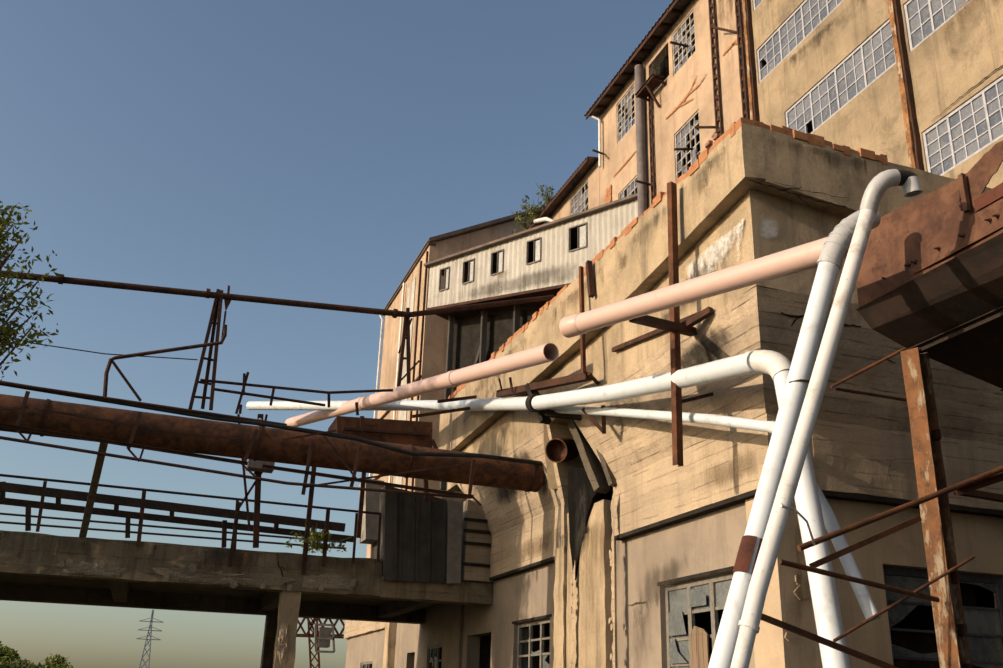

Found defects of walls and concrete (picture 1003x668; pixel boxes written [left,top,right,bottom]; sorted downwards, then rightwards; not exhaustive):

spalling [676,117,888,184]
spalling [488,191,667,361]